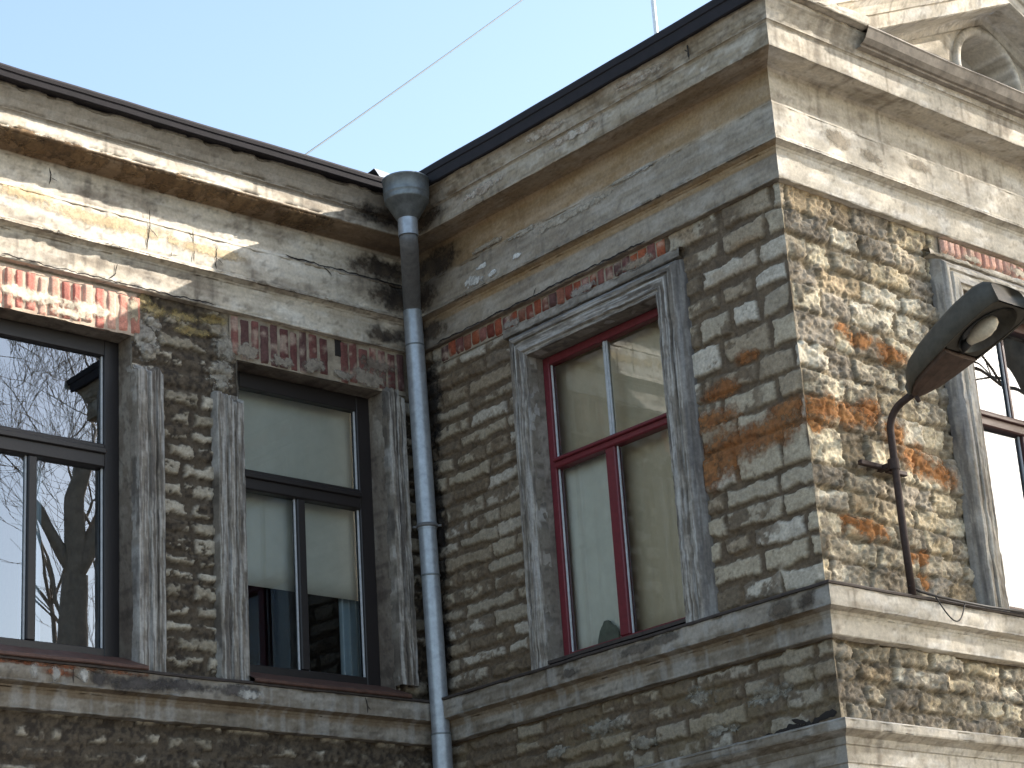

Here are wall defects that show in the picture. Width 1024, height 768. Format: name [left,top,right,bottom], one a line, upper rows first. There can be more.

water stain [356,203,398,228]
water stain [418,208,440,231]
crack [287,255,402,287]
water stain [351,254,403,312]
water stain [419,243,454,313]
flaking render [441,238,666,363]
water stain [369,326,403,342]